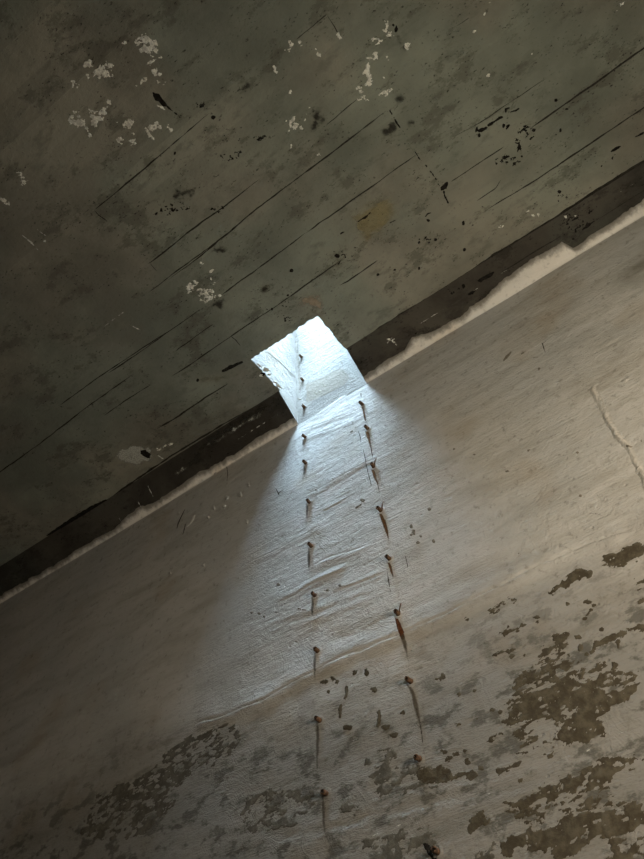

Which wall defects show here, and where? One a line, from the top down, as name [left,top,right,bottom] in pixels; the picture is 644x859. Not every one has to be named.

peeling [602,542,644,568]
peeling [548,568,593,596]
corrosion [394,616,407,651]
peeling [499,615,541,637]
peeling [320,676,353,730]
corrosion [409,687,420,722]
peeling [487,624,644,783]
peeling [364,710,484,798]
peeling [467,810,490,835]
peeling [475,754,644,859]